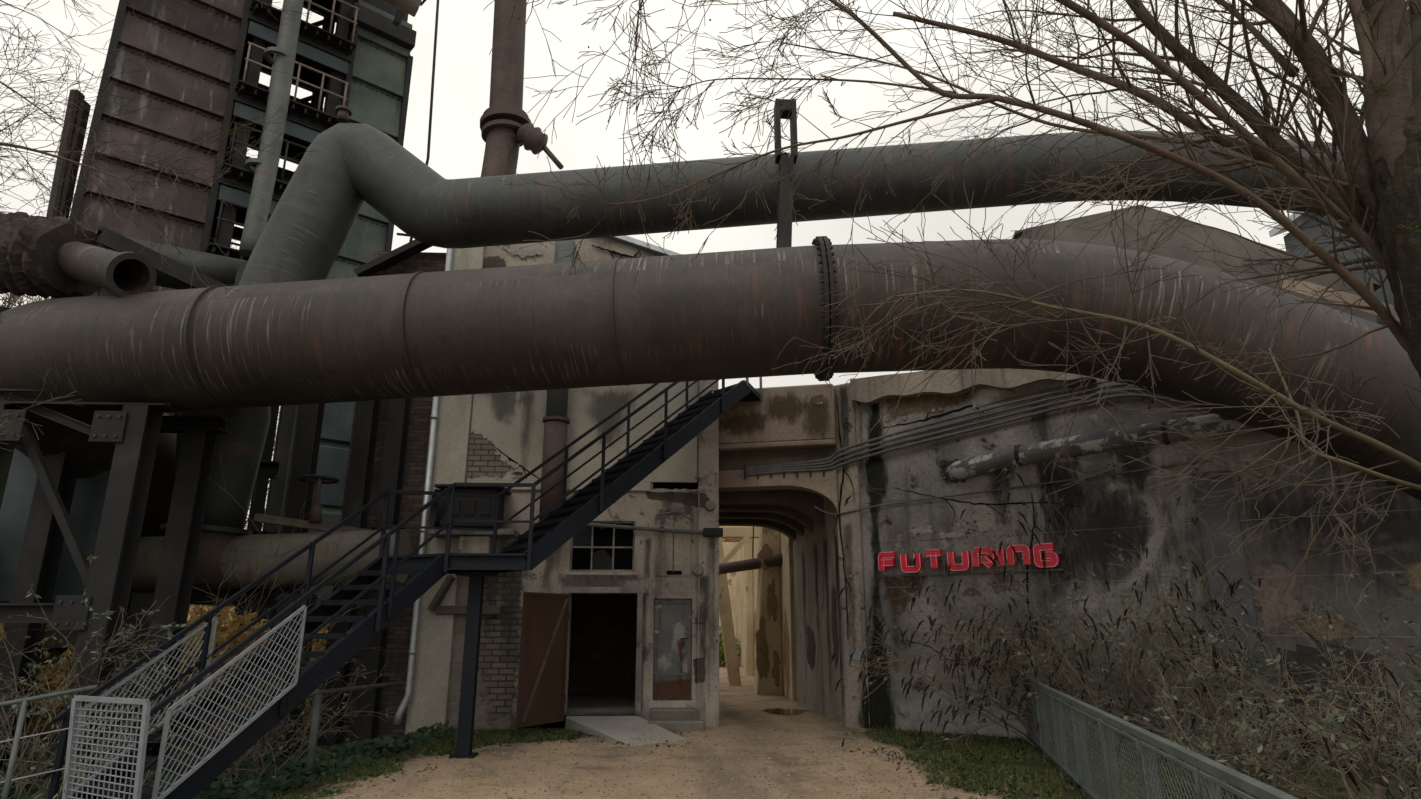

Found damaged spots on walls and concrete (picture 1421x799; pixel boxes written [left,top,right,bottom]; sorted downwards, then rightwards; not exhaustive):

peeling [466,430,523,479]
leakage [594,393,628,442]
leakage [721,387,895,730]
leakage [1039,461,1082,532]
leakage [1062,446,1166,625]
peeling [478,571,523,725]